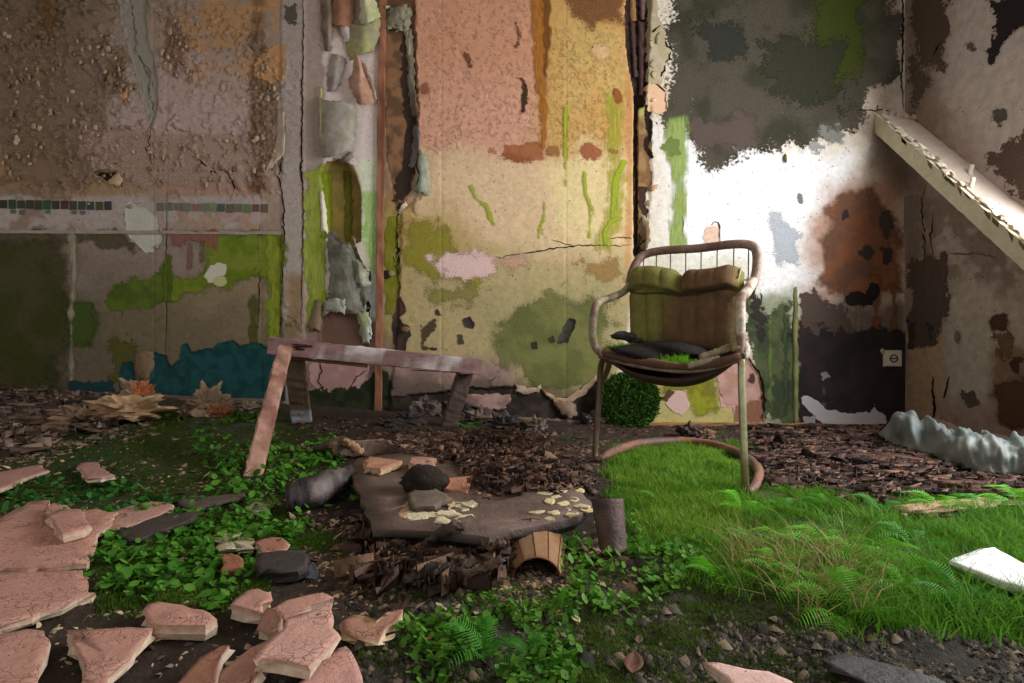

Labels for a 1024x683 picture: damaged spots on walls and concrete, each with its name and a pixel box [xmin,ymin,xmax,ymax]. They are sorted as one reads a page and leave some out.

flaking render [320,0,430,215]
crack [499,0,649,258]
damp [645,0,953,177]
damp [964,0,1024,65]
damp [991,108,1007,128]
peeling [318,159,372,347]
rust [819,187,903,332]
peeling [67,340,275,399]
flaking render [390,390,451,412]
flaking render [465,375,605,423]
damp [488,283,623,390]
damp [744,251,952,424]